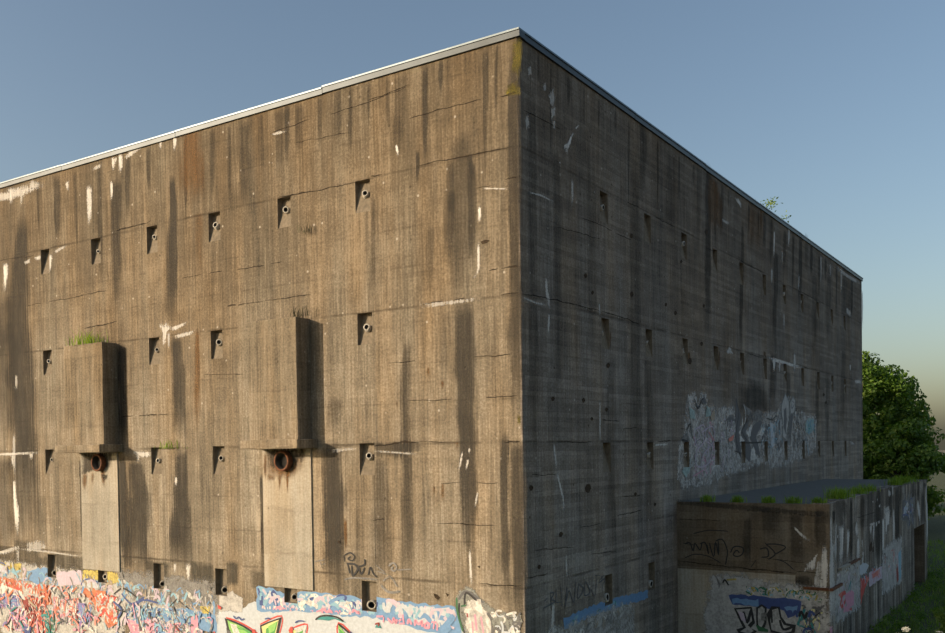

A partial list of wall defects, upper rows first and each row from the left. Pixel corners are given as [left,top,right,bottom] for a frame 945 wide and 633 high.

leakage [416,64,442,175]
leakage [0,183,36,201]
leakage [0,228,63,529]
leakage [455,312,478,538]
leakage [796,484,899,618]
leakage [917,482,928,537]